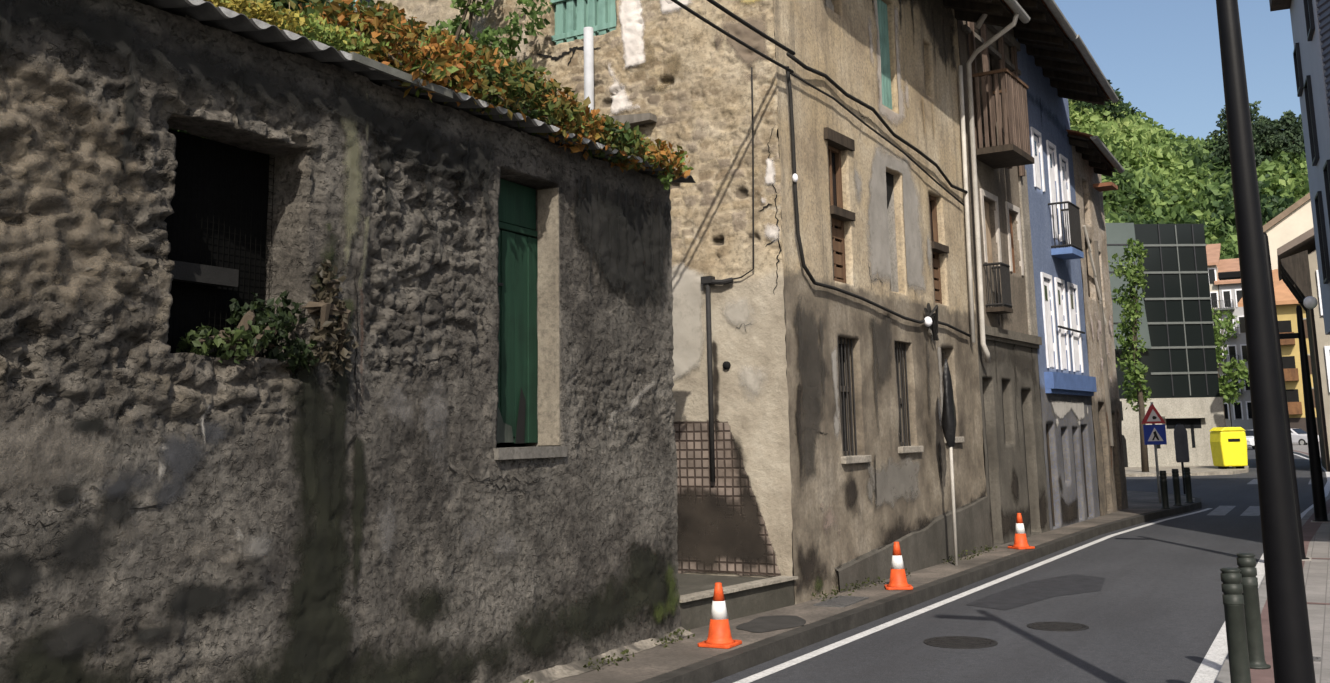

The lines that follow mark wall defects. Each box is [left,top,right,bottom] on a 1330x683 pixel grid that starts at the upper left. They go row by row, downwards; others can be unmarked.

peeling [609,0,689,113]
water stain [574,176,670,306]
water stain [794,303,827,476]
water stain [870,313,892,423]
water stain [4,615,129,683]
water stain [0,406,226,596]
water stain [131,582,260,644]
water stain [242,341,772,683]
water stain [796,546,840,593]
water stain [845,477,858,508]
water stain [878,511,948,550]